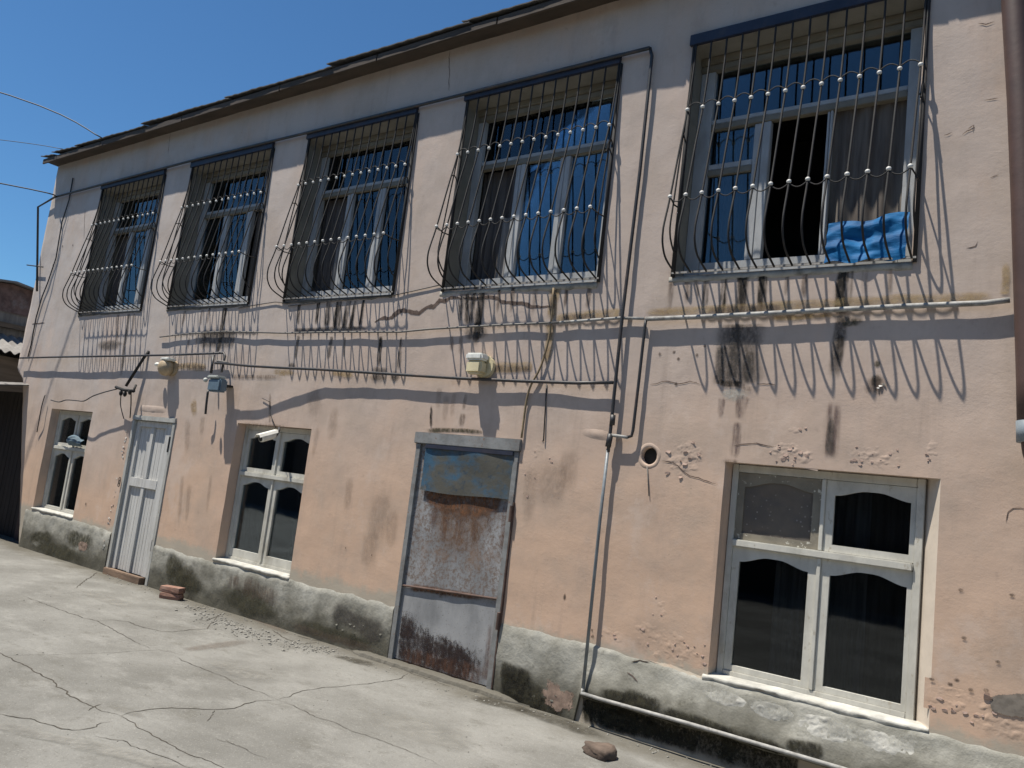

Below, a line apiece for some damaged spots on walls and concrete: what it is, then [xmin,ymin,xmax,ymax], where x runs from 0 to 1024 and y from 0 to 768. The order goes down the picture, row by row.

leakage [716,276,772,411]
leakage [832,272,861,371]
peeling [663,438,703,478]
peeling [764,427,818,471]
leakage [825,407,837,454]
rust [426,491,500,532]
mould [31,531,90,561]
rust [412,585,473,599]
crack [1,573,444,768]
rust [398,613,488,684]
spalling [542,680,575,712]
peeling [923,677,1024,741]